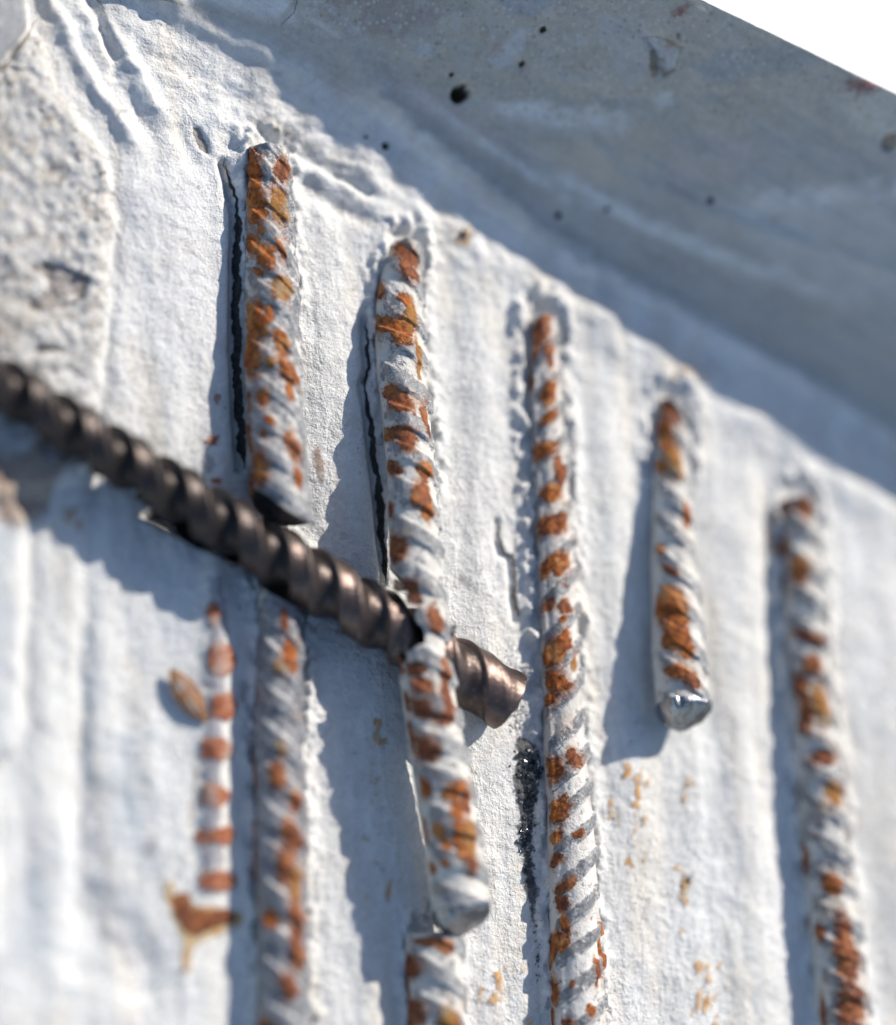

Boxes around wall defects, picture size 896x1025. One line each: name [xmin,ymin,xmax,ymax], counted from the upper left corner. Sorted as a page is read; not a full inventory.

crack [0,0,38,104]
spalling [0,35,114,374]
spalling [193,128,208,153]
spalling [244,142,316,526]
rust [165,577,252,972]
spalling [252,578,313,1025]
spalling [375,237,491,1025]
rust [479,966,526,1004]
spalling [529,314,608,1025]
rust [623,762,651,868]
spalling [651,397,712,732]
spalling [780,496,874,1025]